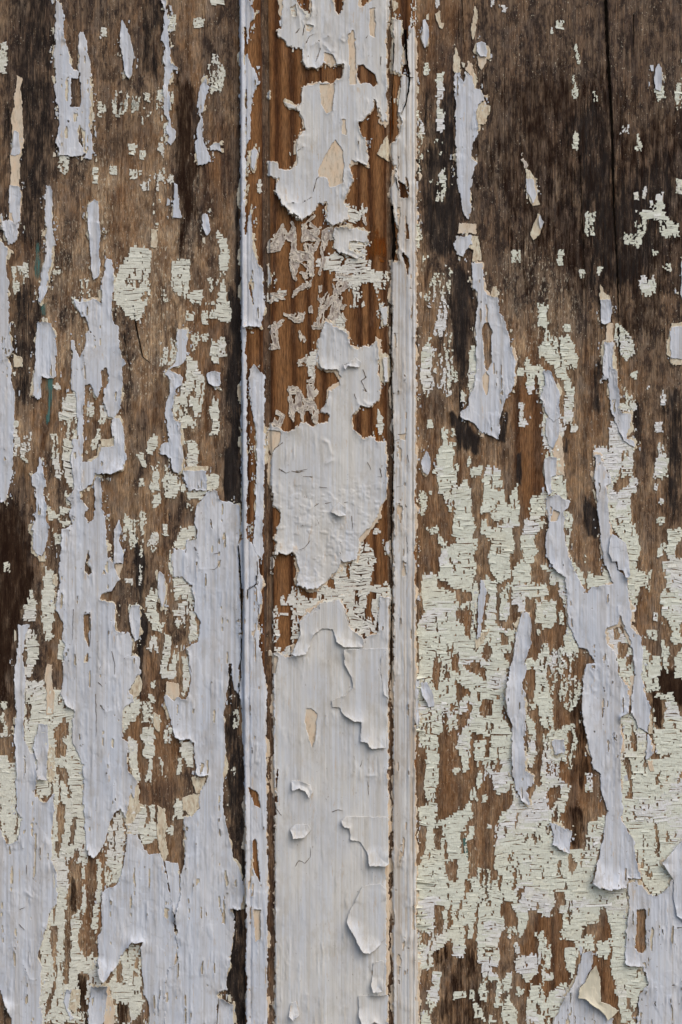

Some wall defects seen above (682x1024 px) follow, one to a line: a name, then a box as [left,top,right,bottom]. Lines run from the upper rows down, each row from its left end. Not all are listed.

peeling [50,0,178,184]
peeling [190,54,226,166]
peeling [450,44,490,219]
peeling [0,76,32,506]
peeling [33,185,61,306]
peeling [171,230,232,325]
peeling [524,169,544,240]
peeling [623,178,682,297]
peeling [29,317,62,400]
peeling [145,570,179,679]
peeling [653,527,682,645]
peeling [513,930,554,986]